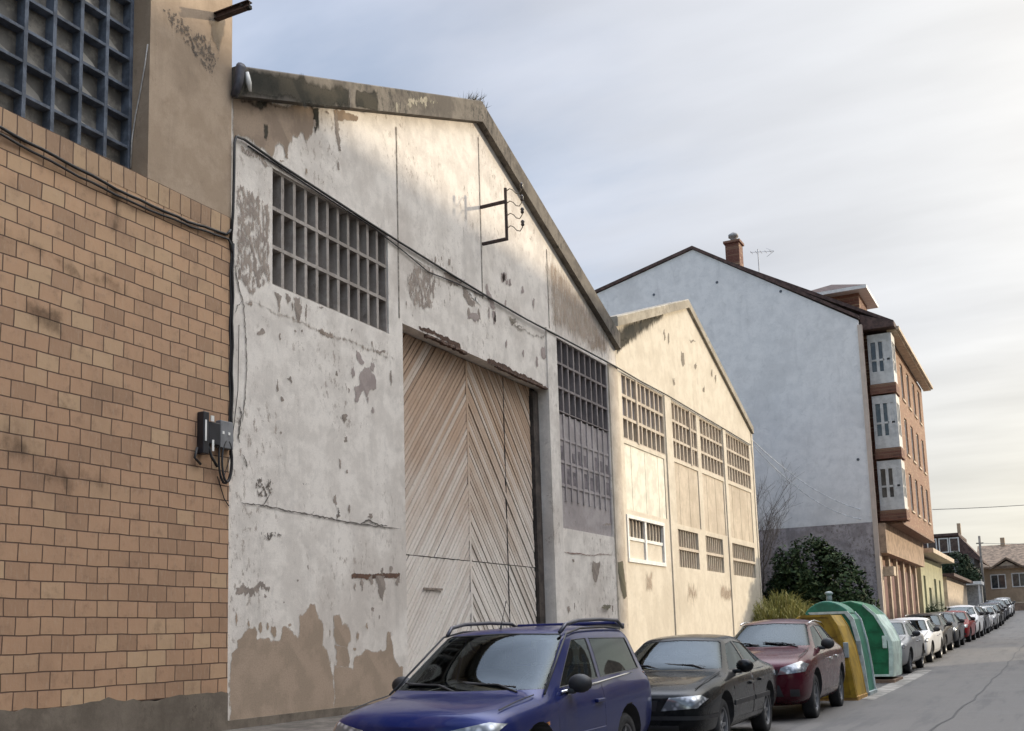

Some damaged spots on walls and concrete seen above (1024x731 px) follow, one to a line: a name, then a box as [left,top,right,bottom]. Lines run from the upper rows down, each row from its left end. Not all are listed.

peeling [163,9,219,74]
peeling [232,99,314,167]
damp [238,70,378,170]
peeling [334,109,358,121]
peeling [236,185,323,332]
peeling [406,256,507,349]
peeling [348,342,385,414]
peeling [256,477,272,497]
crack [243,494,399,529]
spalling [236,581,270,598]
corrosion [352,566,400,618]
peeling [228,603,403,720]